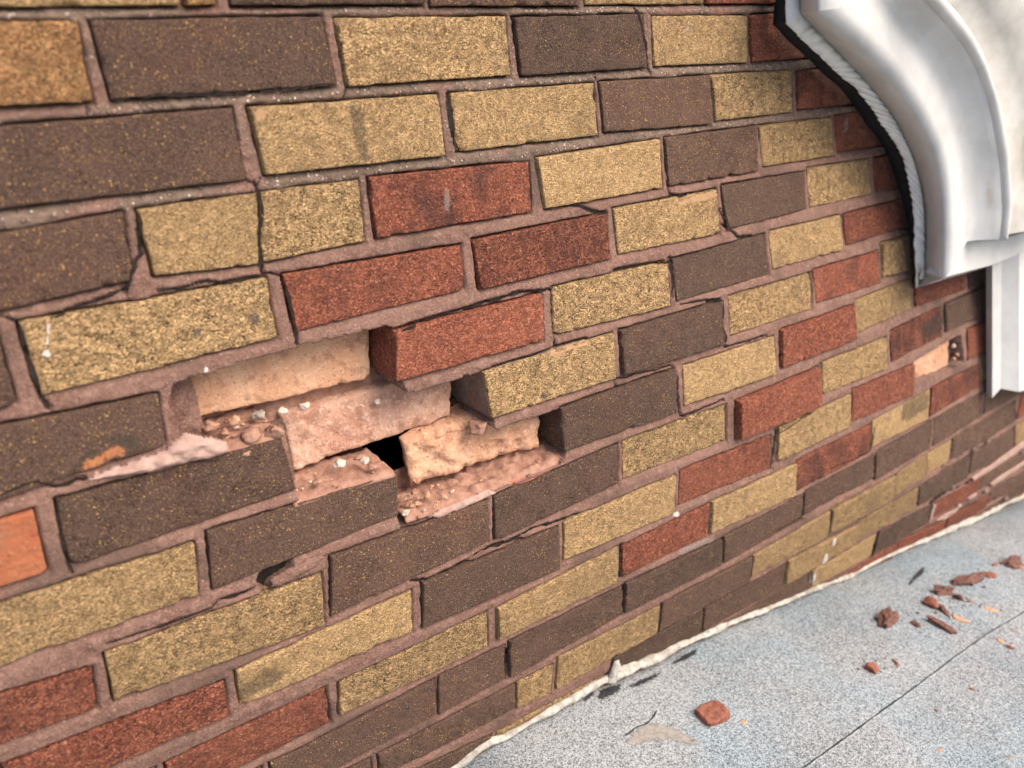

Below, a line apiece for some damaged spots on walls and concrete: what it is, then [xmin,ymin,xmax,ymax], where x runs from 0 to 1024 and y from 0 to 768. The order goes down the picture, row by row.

crack [54,214,144,318]
crack [159,175,299,345]
spalling [191,329,540,486]
crack [0,477,88,574]
spalling [432,489,496,518]